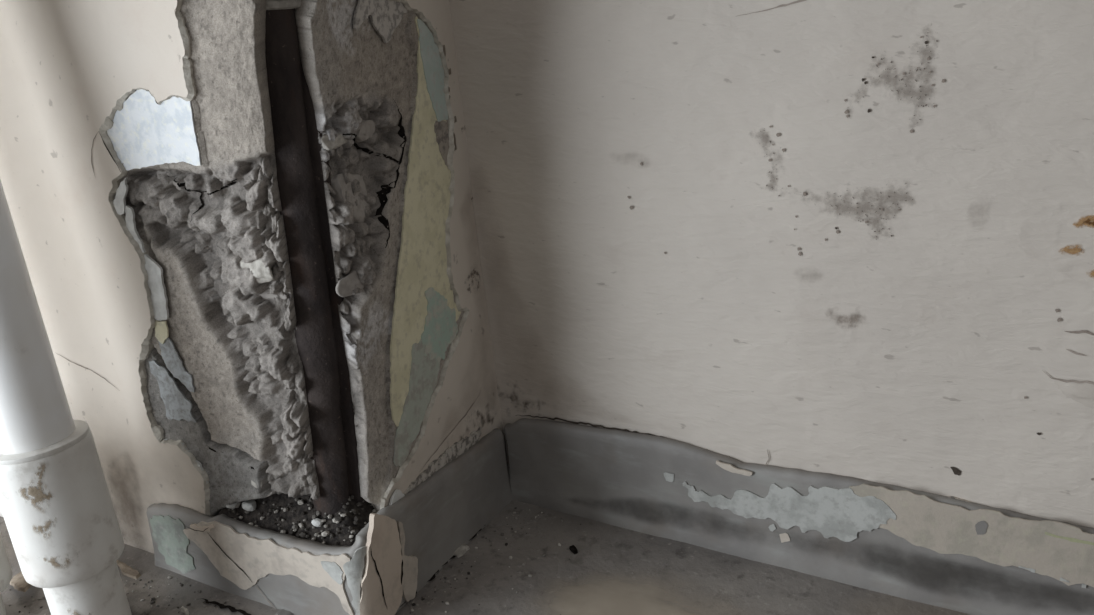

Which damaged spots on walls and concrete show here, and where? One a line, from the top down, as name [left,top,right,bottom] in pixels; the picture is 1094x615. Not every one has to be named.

leakage [862,32,945,133]
crack [168,176,237,222]
flaking render [99,0,355,615]
rust [265,0,367,516]
crack [343,99,407,248]
flaking render [295,0,482,513]
rust [1073,216,1094,227]
crack [371,523,403,607]